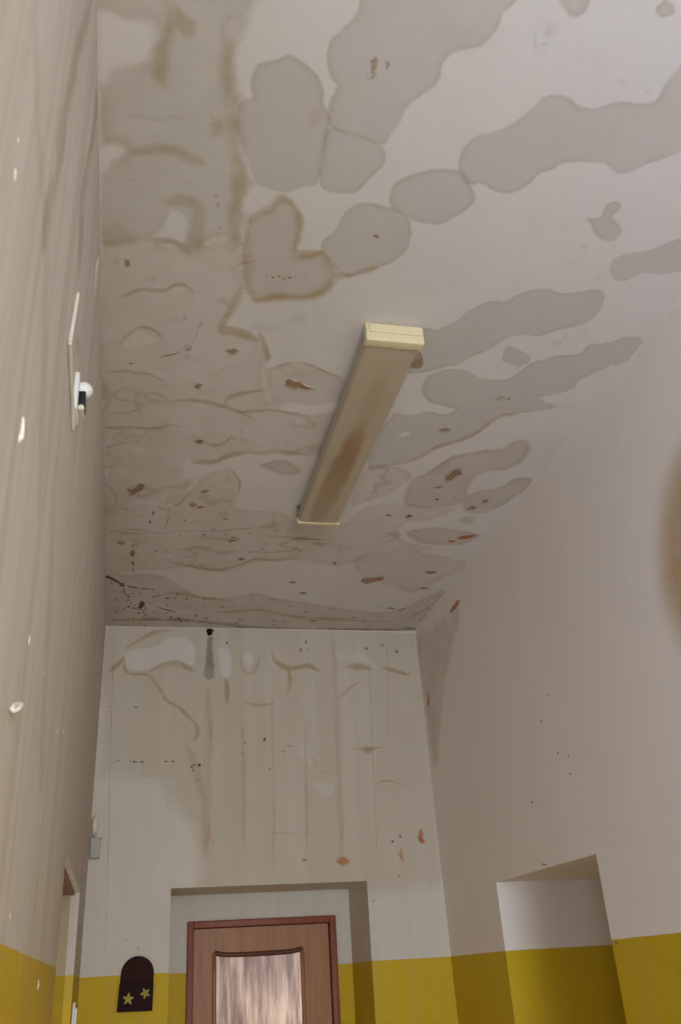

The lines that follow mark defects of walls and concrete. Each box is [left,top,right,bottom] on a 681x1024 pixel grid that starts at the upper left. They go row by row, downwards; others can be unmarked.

leakage [77,0,681,914]